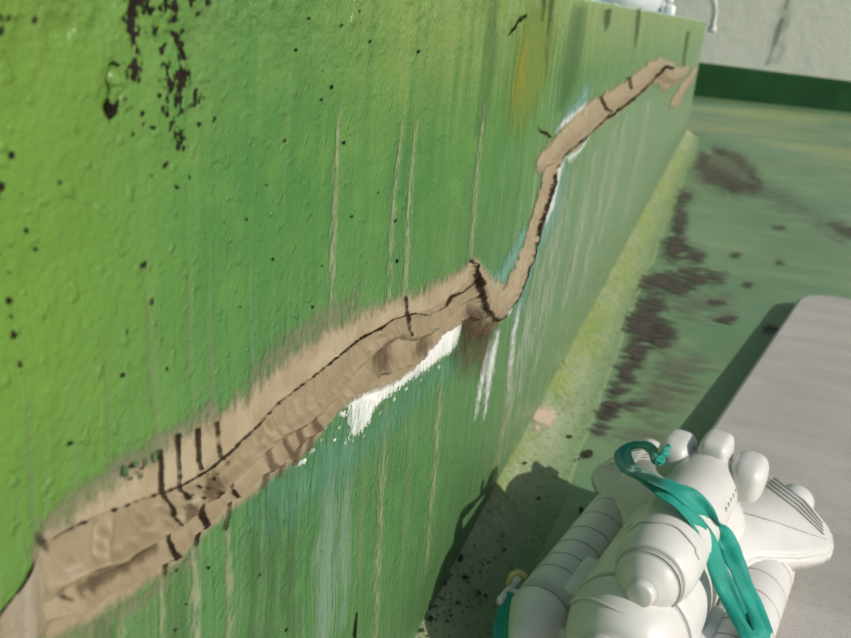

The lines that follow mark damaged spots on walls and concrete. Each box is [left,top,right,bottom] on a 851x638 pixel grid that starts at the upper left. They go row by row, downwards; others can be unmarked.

peeling [556,84,592,132]
peeling [268,322,462,512]
crack [34,57,697,638]
water stain [474,330,500,416]
peeling [492,227,525,284]
water stain [497,305,520,461]
peeling [533,408,556,431]
peeling [508,137,589,316]
water stain [590,188,729,435]
spalling [0,549,44,638]